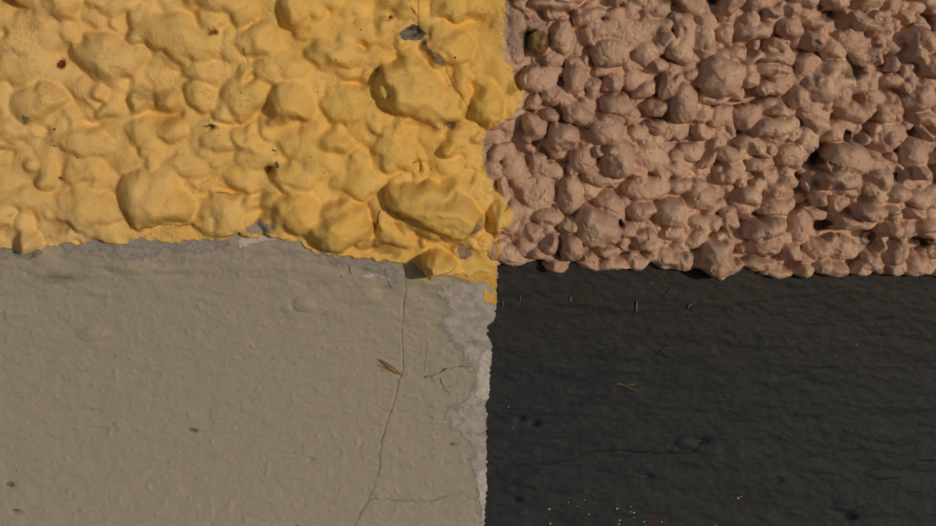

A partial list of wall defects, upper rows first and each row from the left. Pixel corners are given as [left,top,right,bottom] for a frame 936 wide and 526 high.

peeling [62,219,279,260]
peeling [322,253,398,282]
peeling [434,274,504,526]